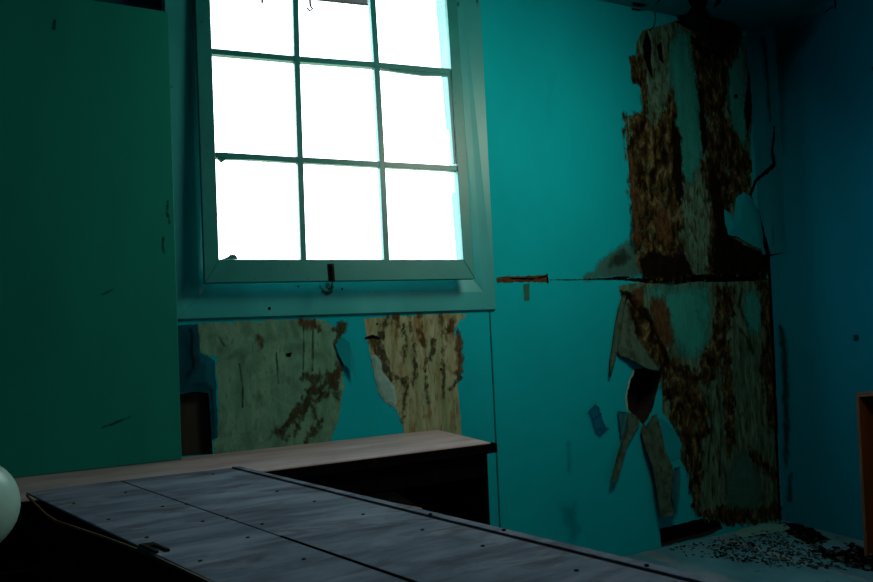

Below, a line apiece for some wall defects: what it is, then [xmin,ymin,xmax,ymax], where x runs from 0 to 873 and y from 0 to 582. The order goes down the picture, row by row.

crack [748,126,776,255]
crack [551,274,629,282]
peeling [618,0,782,527]
peeling [198,317,356,454]
peeling [364,313,467,435]